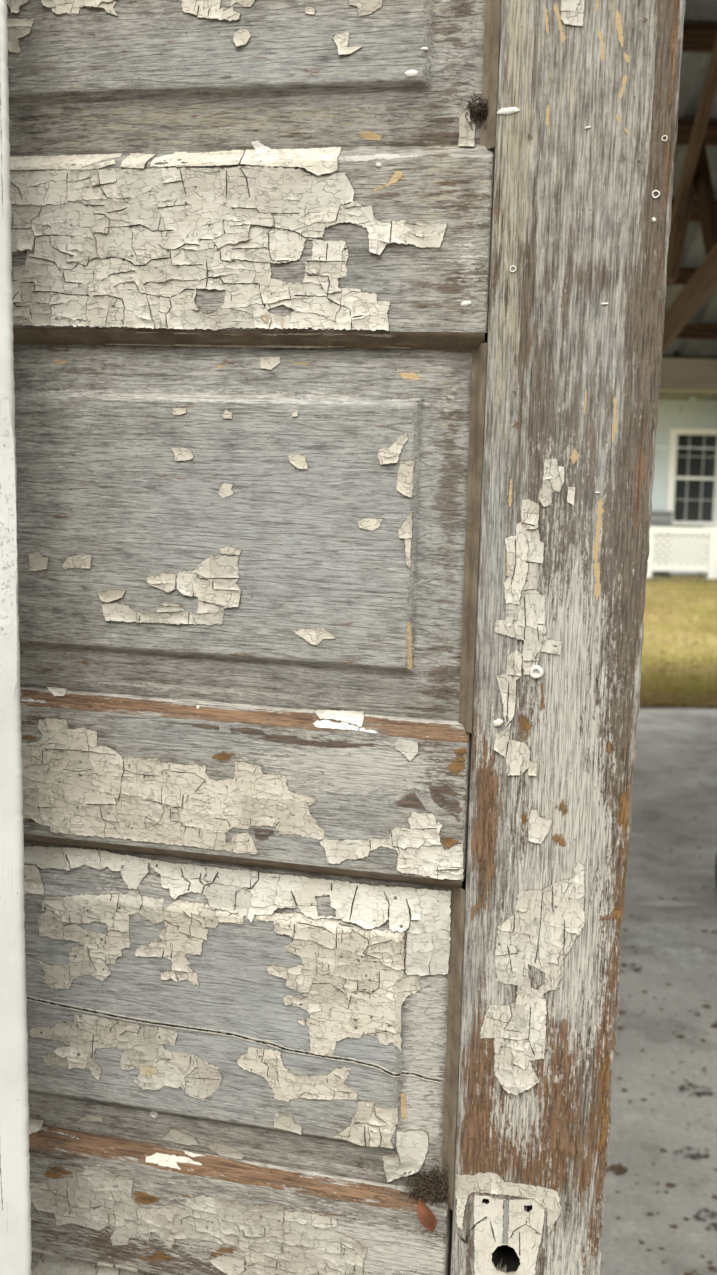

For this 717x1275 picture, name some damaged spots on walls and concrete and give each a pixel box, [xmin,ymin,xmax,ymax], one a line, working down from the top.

peeling [7,0,118,54]
peeling [180,0,255,47]
peeling [333,33,362,56]
peeling [349,0,383,16]
peeling [10,147,448,370]
peeling [288,454,308,469]
peeling [377,432,414,498]
peeling [21,459,575,1182]
peeling [455,862,624,1275]
peeling [30,1166,368,1275]